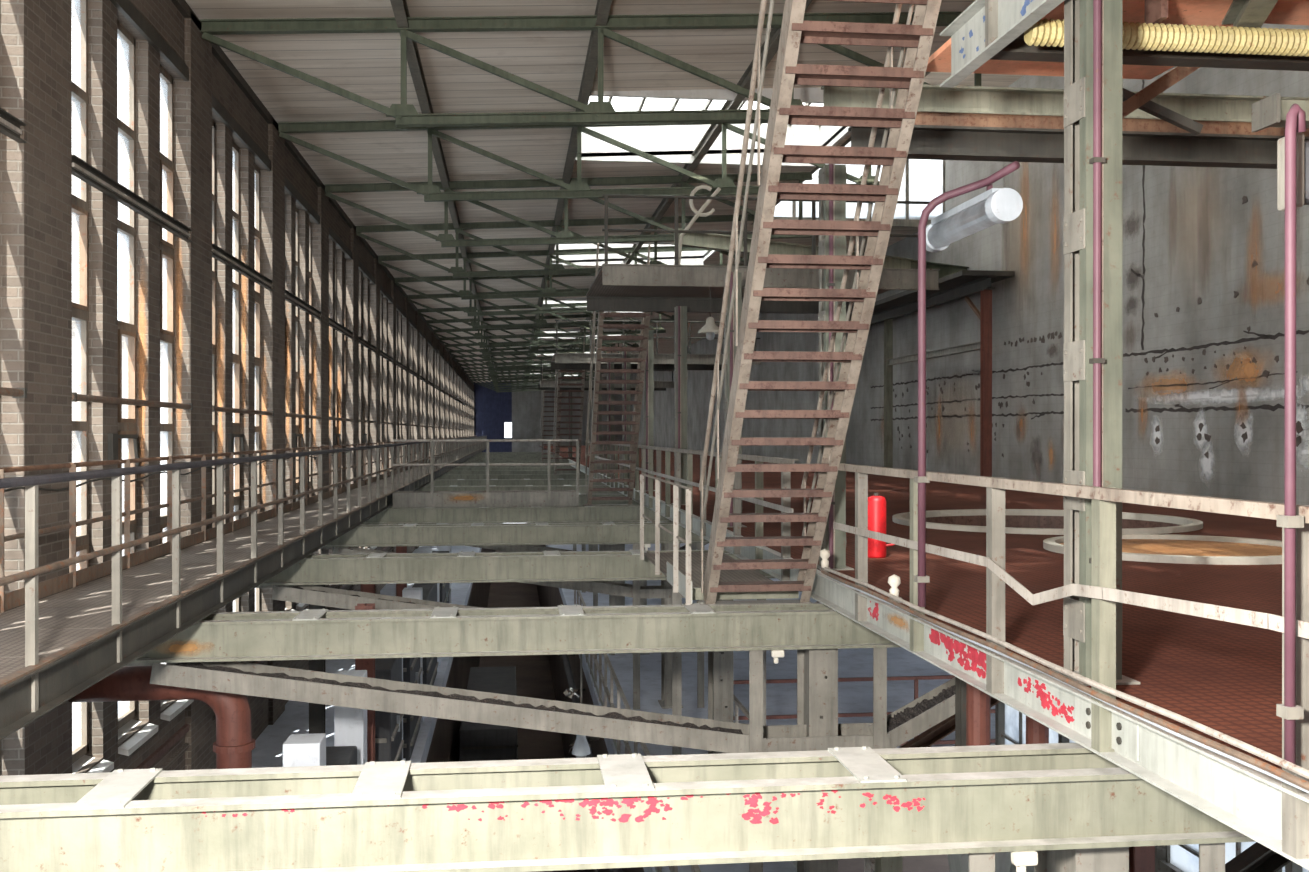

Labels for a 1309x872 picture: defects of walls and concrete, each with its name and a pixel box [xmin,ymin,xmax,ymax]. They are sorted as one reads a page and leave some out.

crack [1123,165,1309,413]